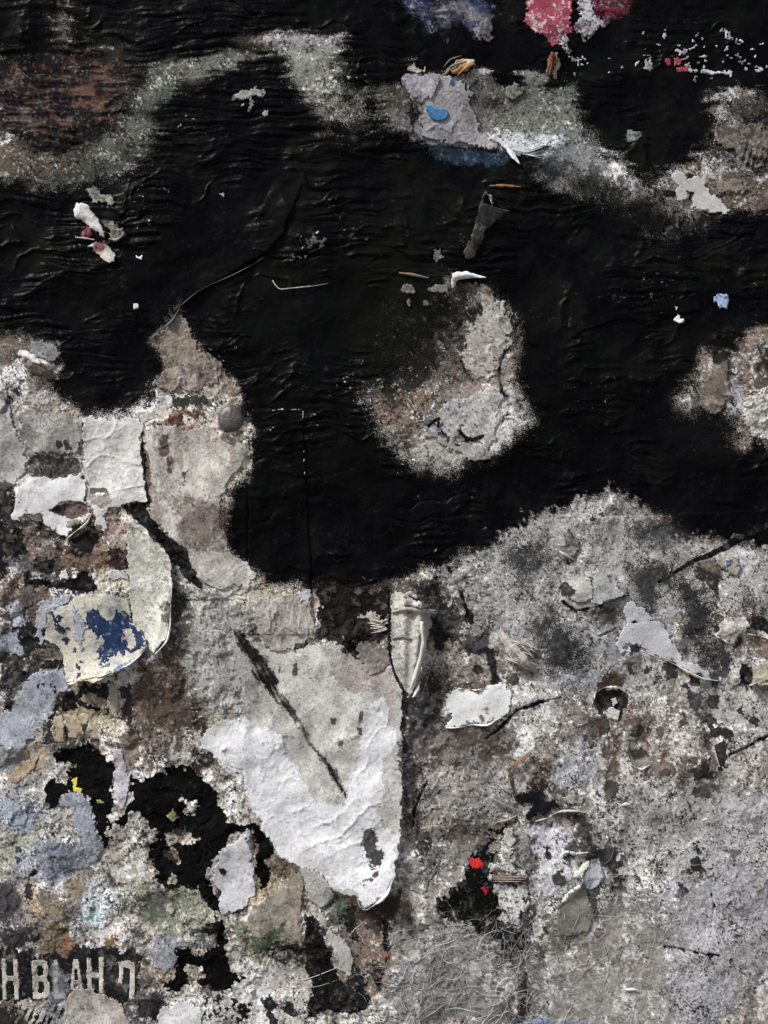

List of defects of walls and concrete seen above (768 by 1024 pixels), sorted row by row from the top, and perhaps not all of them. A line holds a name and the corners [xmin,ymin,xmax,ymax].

peeling [401,63,498,150]
peeling [0,390,317,652]
peeling [356,640,390,675]
peeling [445,682,512,729]
crack [485,700,545,740]
peeling [210,828,354,977]